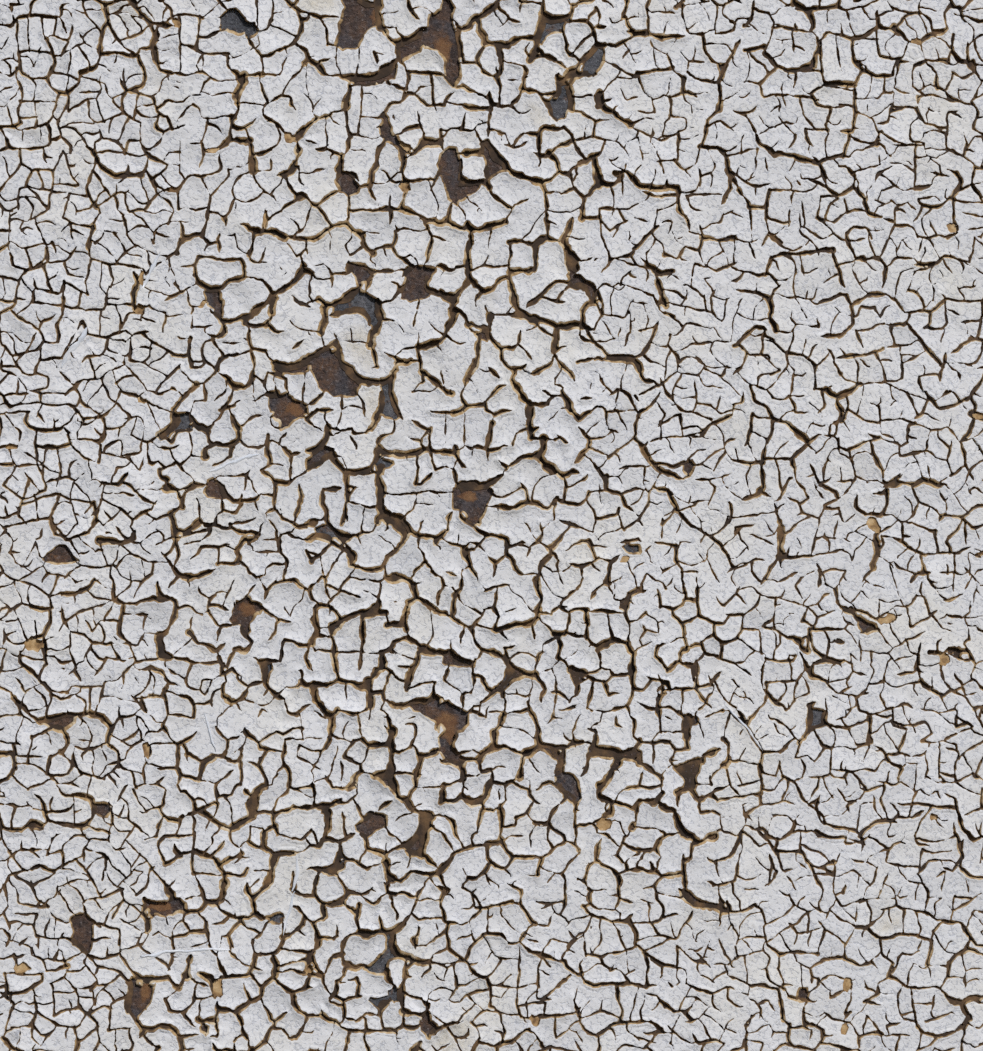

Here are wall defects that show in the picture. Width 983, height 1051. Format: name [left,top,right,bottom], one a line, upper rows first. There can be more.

crack [943,0,983,23]
peeling [121,0,661,579]
crack [654,541,697,574]
crack [884,556,946,589]
peeling [230,597,262,633]
crack [927,634,983,671]
crack [936,757,983,815]
peeling [2,606,852,1051]
crack [756,854,777,885]
crack [685,982,741,1010]
crack [863,982,887,1005]
crack [821,996,909,1051]